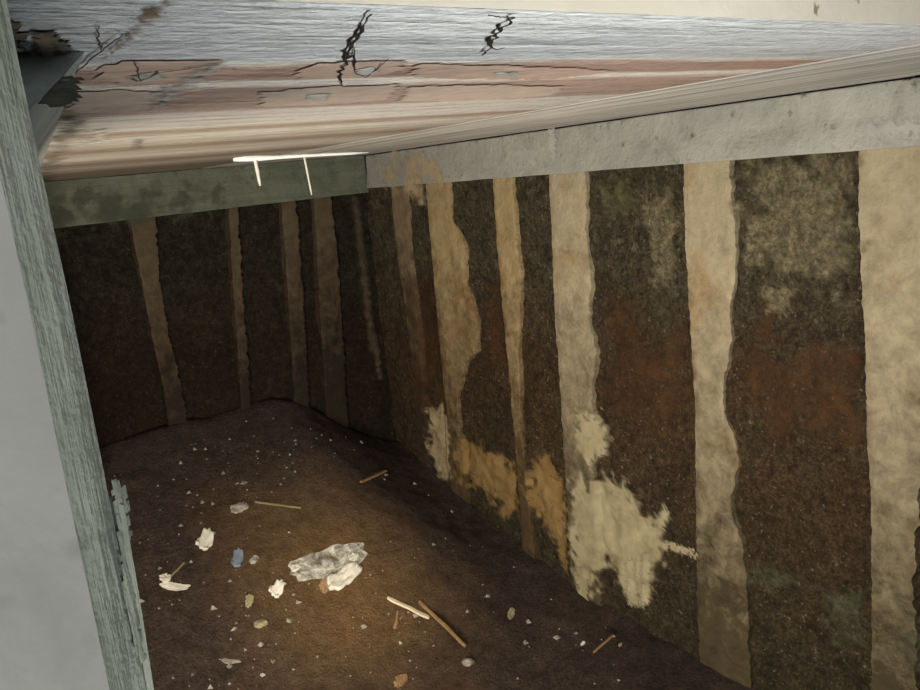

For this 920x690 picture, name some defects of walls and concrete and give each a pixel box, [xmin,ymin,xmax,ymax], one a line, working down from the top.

spalling [11,22,73,57]
crack [337,14,389,86]
damp [425,404,698,608]